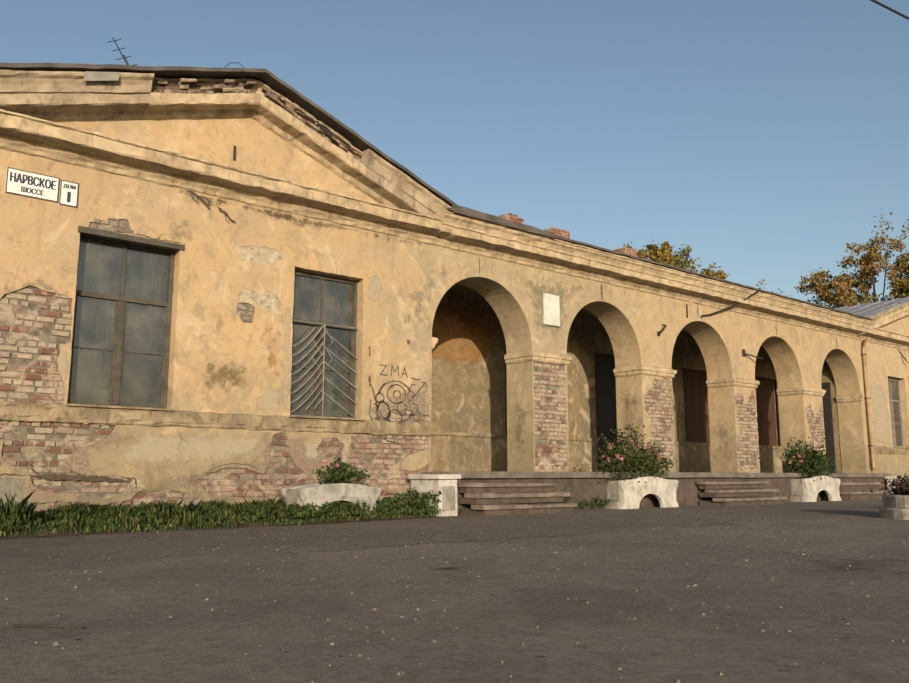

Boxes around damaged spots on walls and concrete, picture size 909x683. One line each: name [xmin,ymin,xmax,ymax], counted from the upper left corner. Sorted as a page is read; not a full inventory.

spalling [89,217,134,234]
crack [187,190,237,224]
spalling [0,284,73,405]
peeling [237,287,291,407]
spalling [0,420,430,513]
spalling [370,391,430,423]
spalling [533,361,568,470]
spalling [644,378,676,471]
spalling [734,388,759,472]
spalling [805,403,826,457]